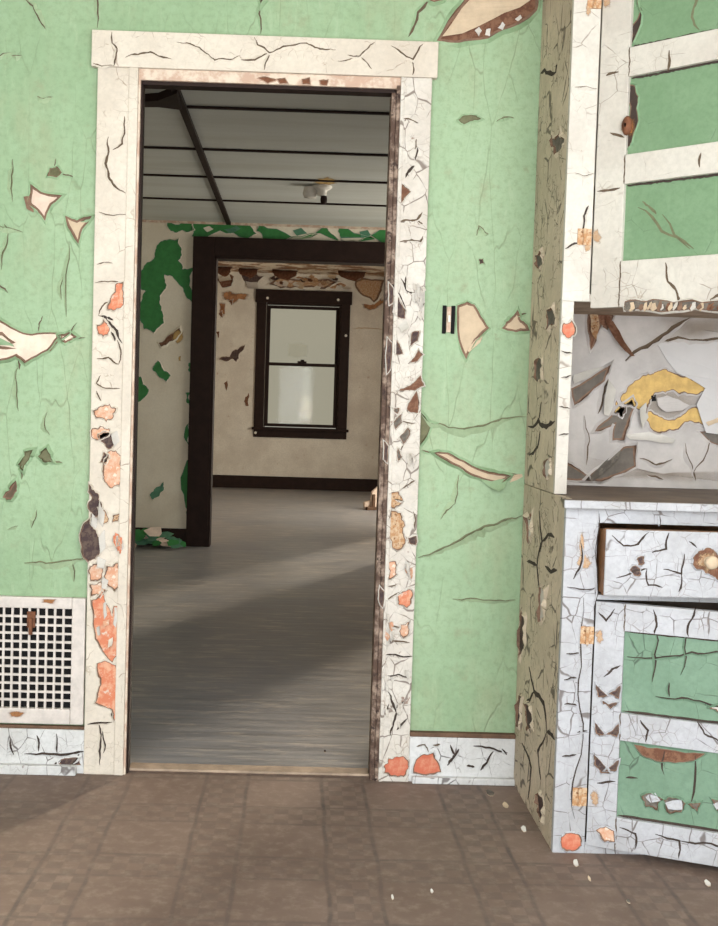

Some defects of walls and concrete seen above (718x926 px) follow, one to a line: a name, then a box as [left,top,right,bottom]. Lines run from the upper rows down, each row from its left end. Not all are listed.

crack [93,0,423,75]
peeling [408,0,542,48]
peeling [24,180,95,247]
peeling [0,316,85,370]
peeling [138,376,149,403]
peeling [152,360,171,382]
peeling [140,223,386,349]
peeling [217,264,426,375]
peeling [455,300,530,363]
peeling [383,374,523,491]
peeling [79,403,124,723]
peeling [382,744,443,778]